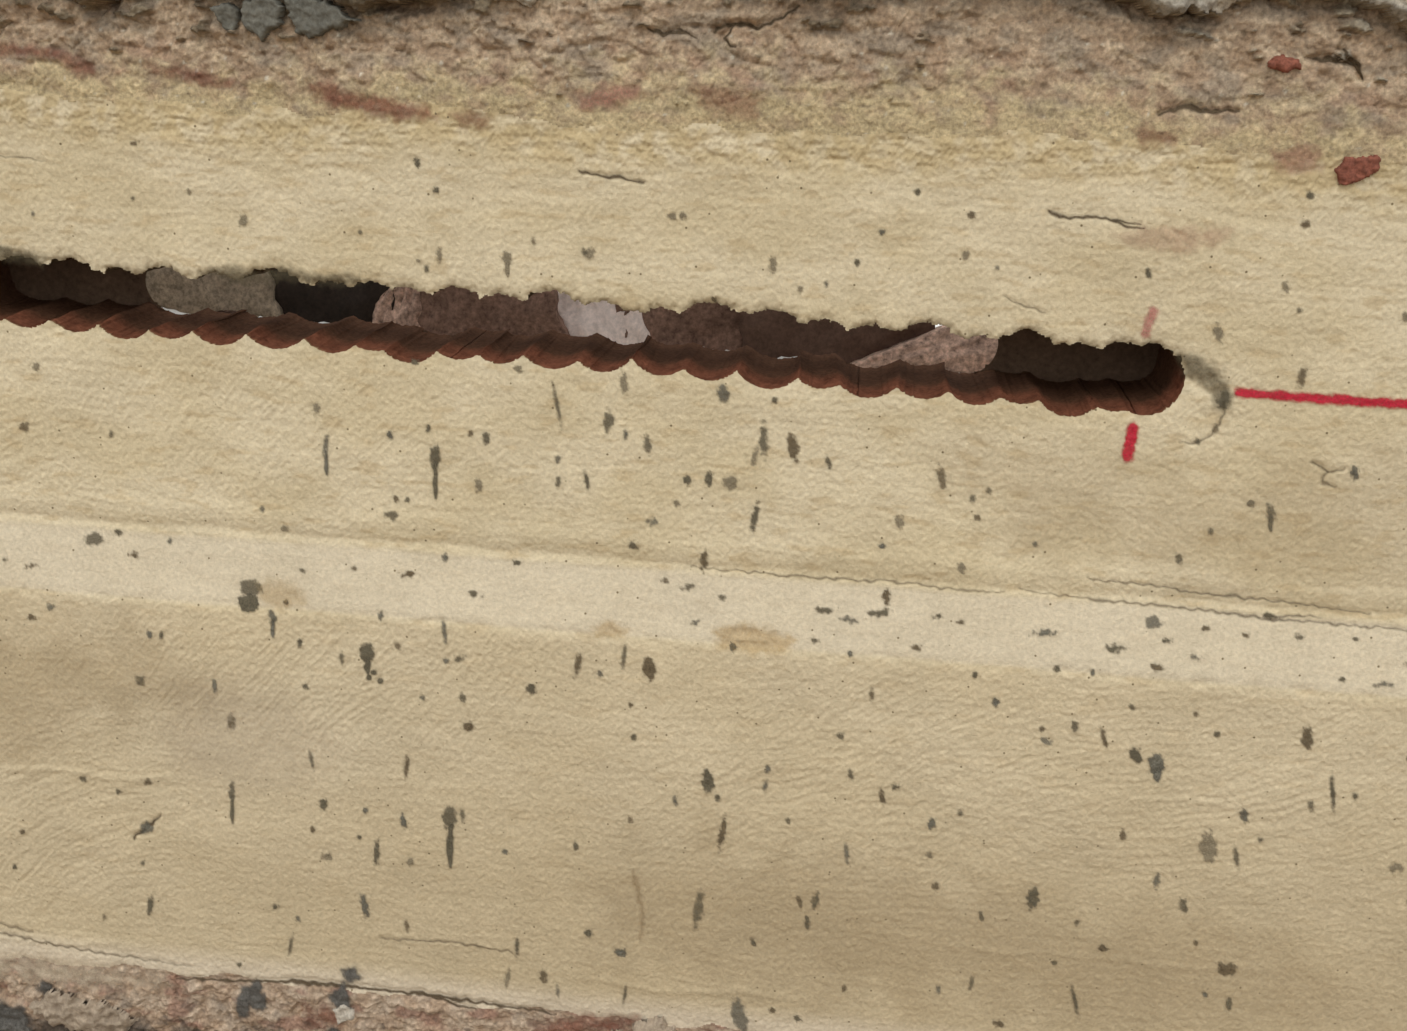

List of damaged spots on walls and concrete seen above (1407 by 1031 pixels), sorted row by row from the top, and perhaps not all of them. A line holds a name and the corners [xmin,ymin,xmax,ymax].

spalling [0,0,1407,166]
spalling [0,957,647,1031]
spalling [667,1023,740,1031]